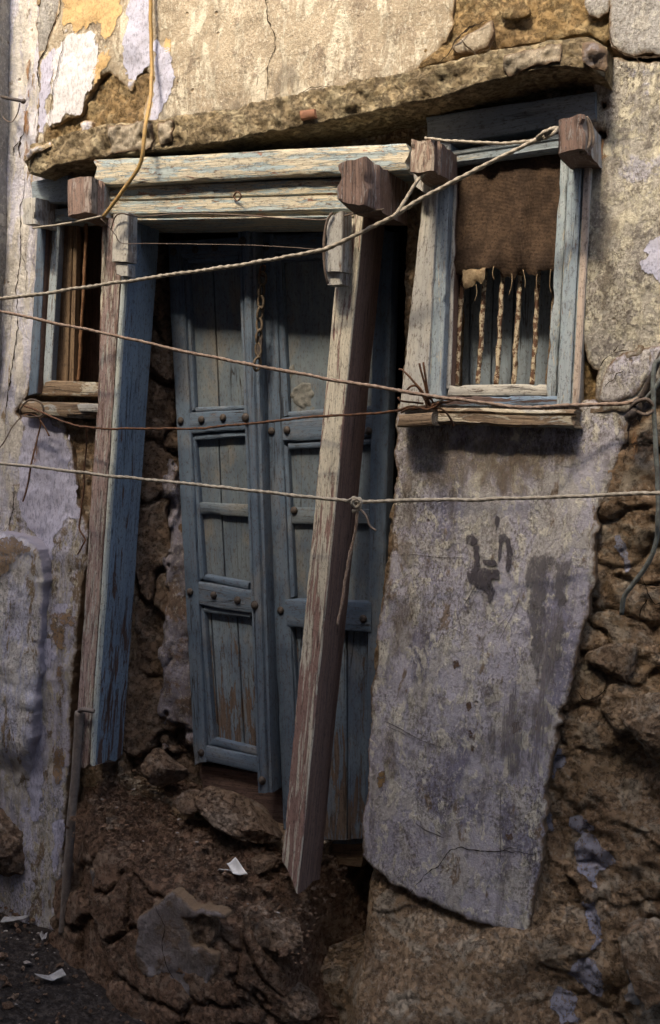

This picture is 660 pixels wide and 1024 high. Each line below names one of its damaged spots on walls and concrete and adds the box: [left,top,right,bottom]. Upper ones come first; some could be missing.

peeling [36,0,175,142]
crack [256,0,280,100]
flaking render [44,603,75,683]
crack [409,847,536,895]